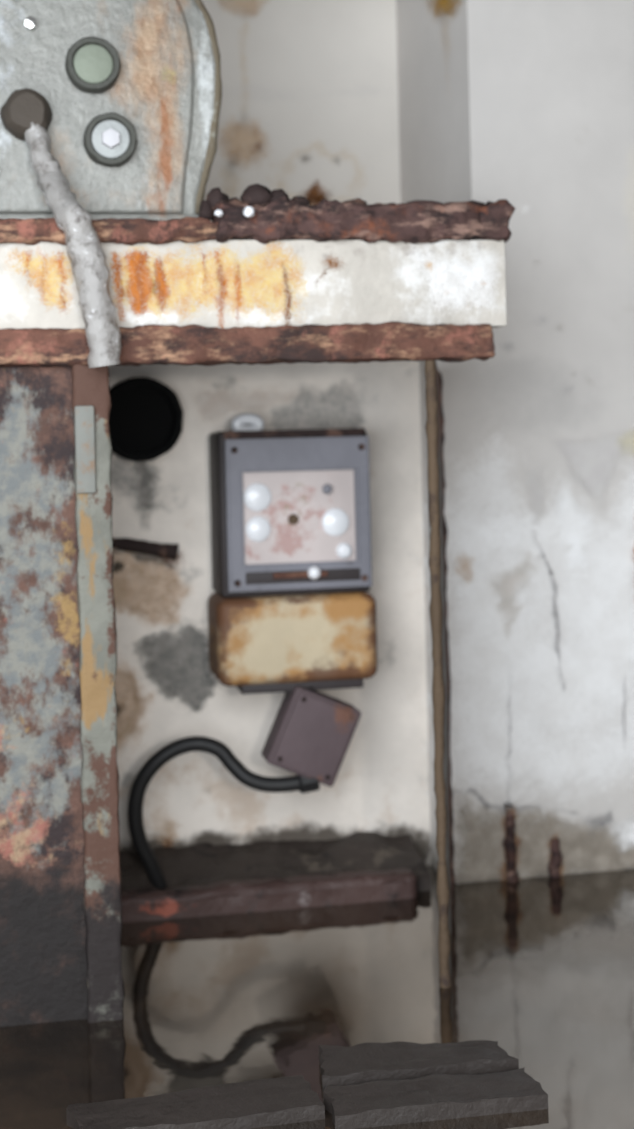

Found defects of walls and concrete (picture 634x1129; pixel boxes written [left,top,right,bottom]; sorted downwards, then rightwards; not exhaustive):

rust [267,140,368,205]
rust [4,248,75,316]
rust [105,238,344,327]
crack [531,532,567,694]